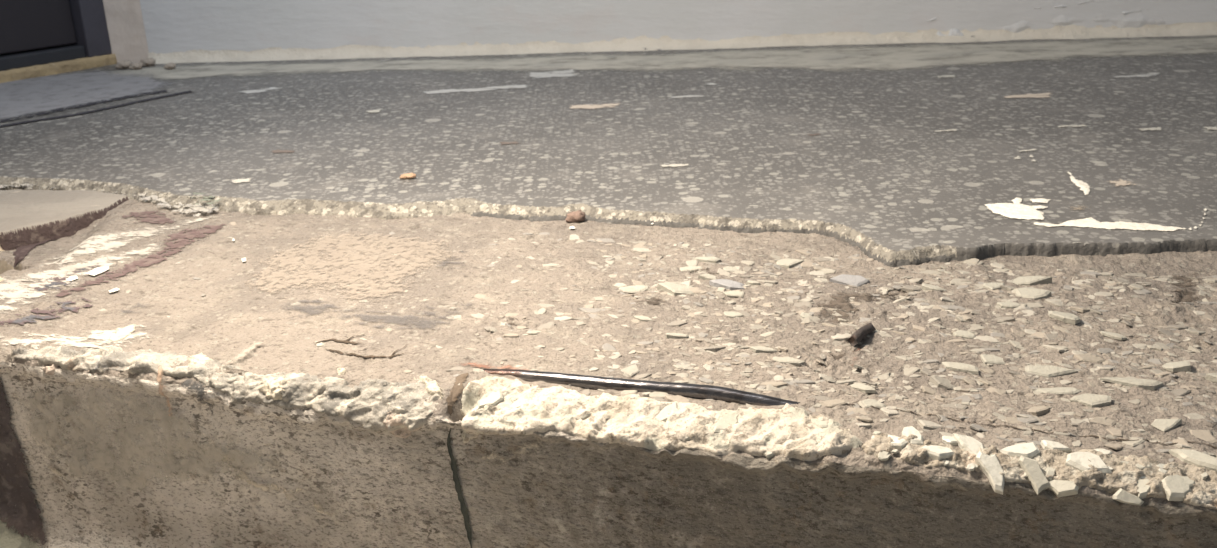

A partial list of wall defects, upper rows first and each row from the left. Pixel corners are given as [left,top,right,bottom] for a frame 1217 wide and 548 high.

crack [447,428,472,548]
spalling [0,168,1217,511]